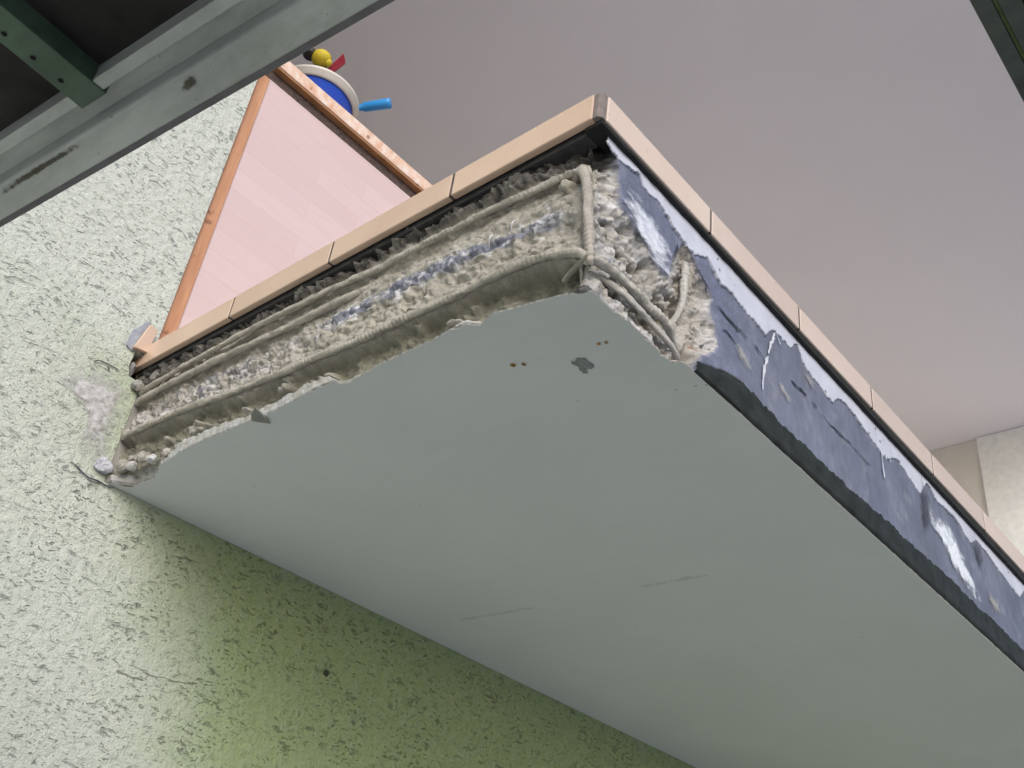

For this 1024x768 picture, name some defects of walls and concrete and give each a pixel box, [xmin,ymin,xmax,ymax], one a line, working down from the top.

crack [71,461,112,488]
spalling [94,137,1024,597]